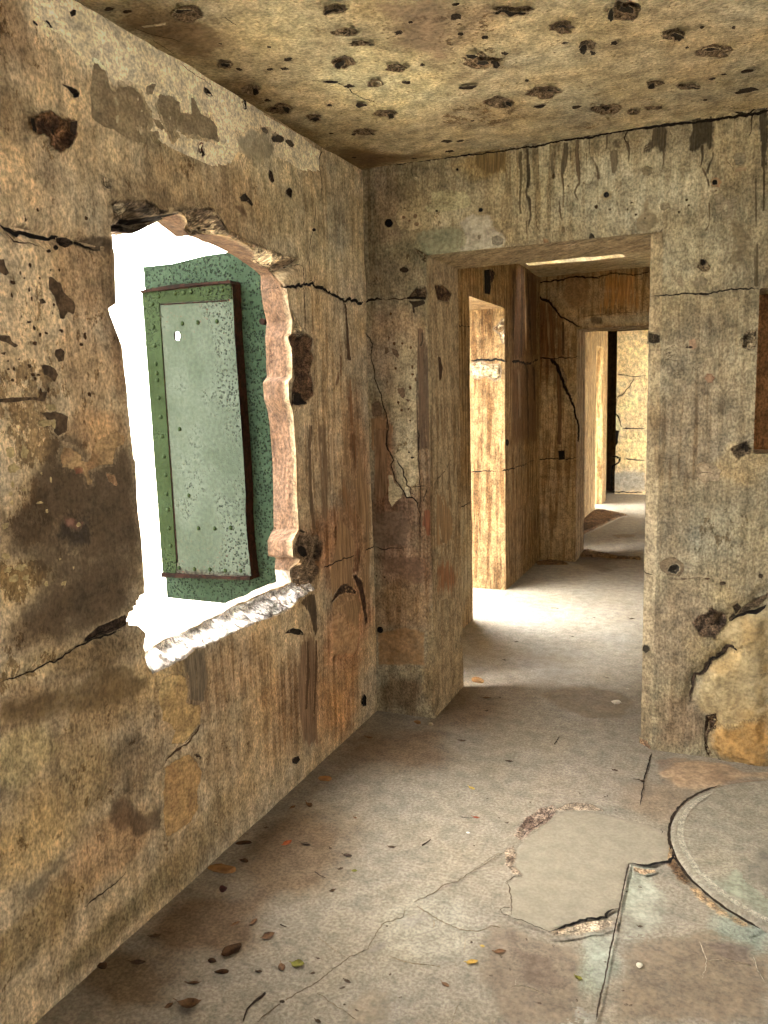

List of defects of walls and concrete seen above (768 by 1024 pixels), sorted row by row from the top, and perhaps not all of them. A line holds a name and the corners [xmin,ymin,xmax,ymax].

spalling [320,2,377,70]
spalling [601,0,644,24]
crack [0,221,113,257]
flaking render [24,57,220,157]
crack [391,109,768,180]
leakage [550,126,670,221]
leakage [686,115,718,231]
leakage [724,107,768,287]
spalling [289,308,315,411]
crack [266,149,580,567]
leakage [0,404,145,655]
crack [0,614,127,683]